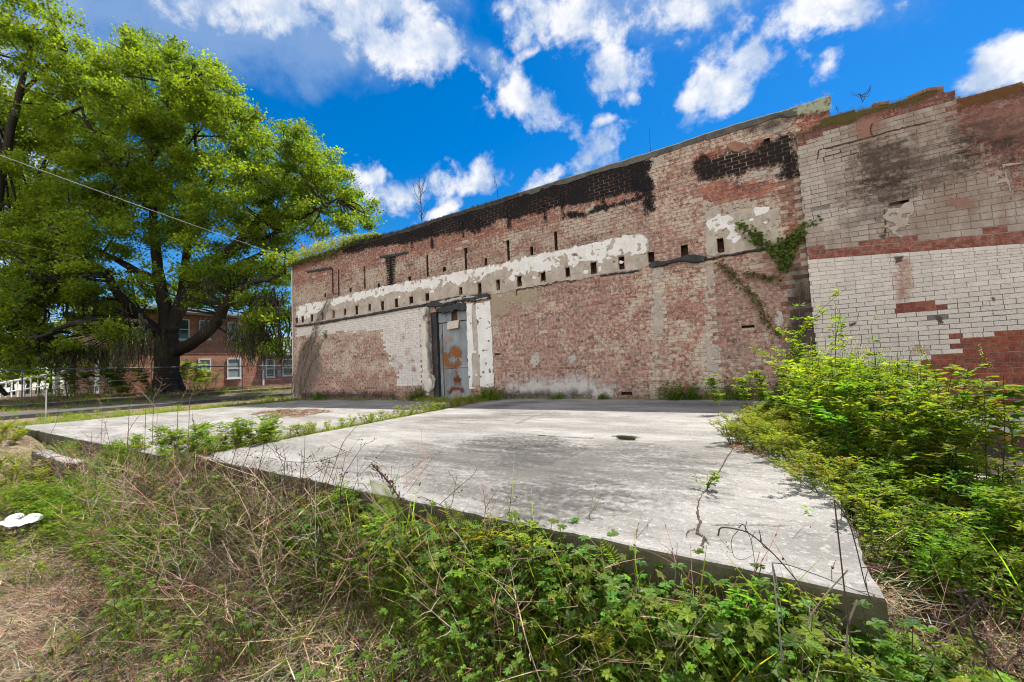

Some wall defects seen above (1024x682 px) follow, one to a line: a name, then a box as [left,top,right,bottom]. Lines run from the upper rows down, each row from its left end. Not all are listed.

damp [642,179,656,216]
peeling [738,168,785,186]
damp [853,121,1020,201]
peeling [704,199,780,331]
peeling [295,232,667,396]
peeling [889,300,947,324]
rust [439,345,464,394]
peeling [901,330,1024,417]
crack [686,494,790,548]